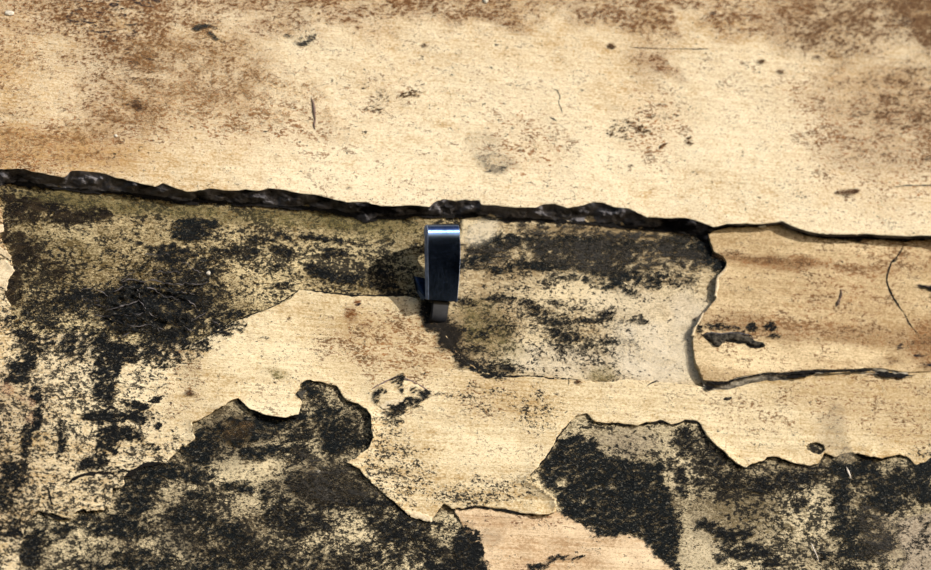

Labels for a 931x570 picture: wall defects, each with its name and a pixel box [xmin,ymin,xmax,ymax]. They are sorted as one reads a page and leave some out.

damp [0,0,931,173]
spalling [0,183,727,386]
crack [0,169,758,242]
crack [792,229,925,335]
damp [0,193,491,570]
spalling [19,378,931,570]
damp [527,554,586,570]